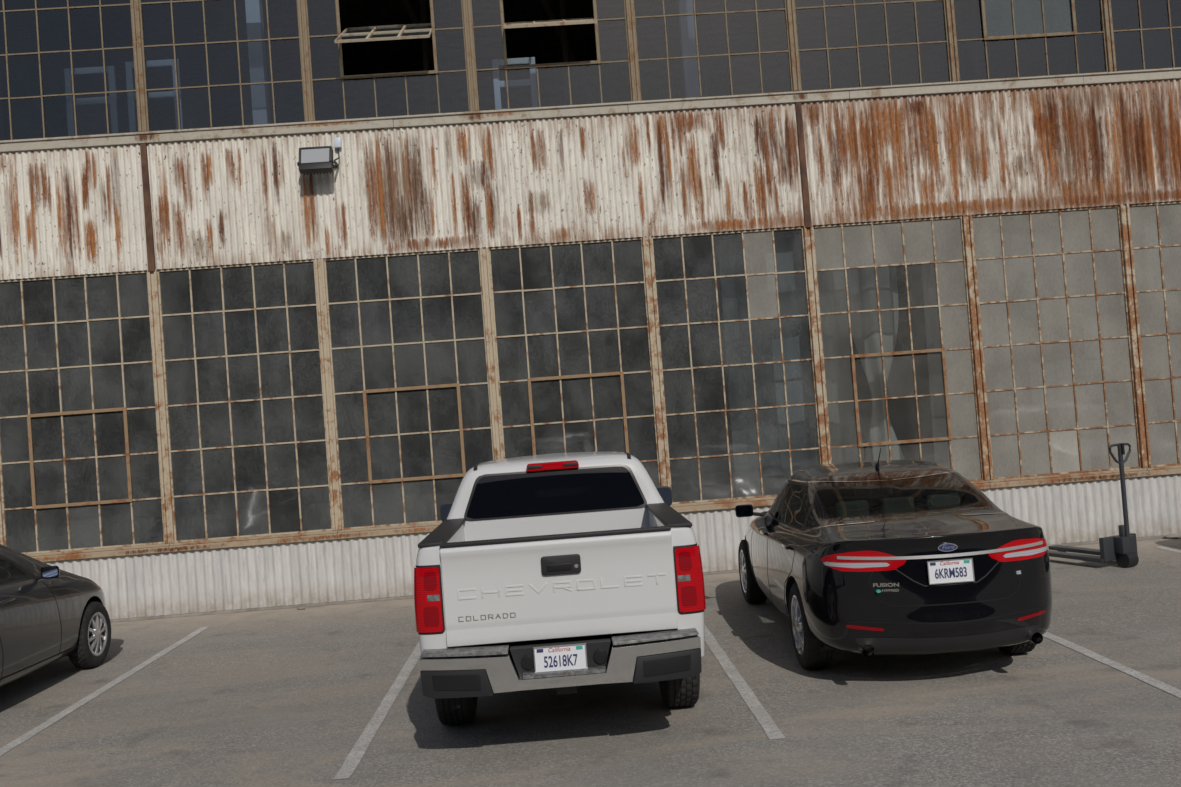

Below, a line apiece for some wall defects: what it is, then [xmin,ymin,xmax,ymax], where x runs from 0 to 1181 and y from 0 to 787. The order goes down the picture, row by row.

rust [0,152,121,261]
rust [262,143,280,201]
rust [301,174,347,252]
rust [366,111,513,250]
rust [517,191,546,240]
rust [532,130,544,171]
rust [626,109,798,229]
rust [794,93,1013,219]
rust [1001,138,1024,183]
rust [1030,89,1181,207]